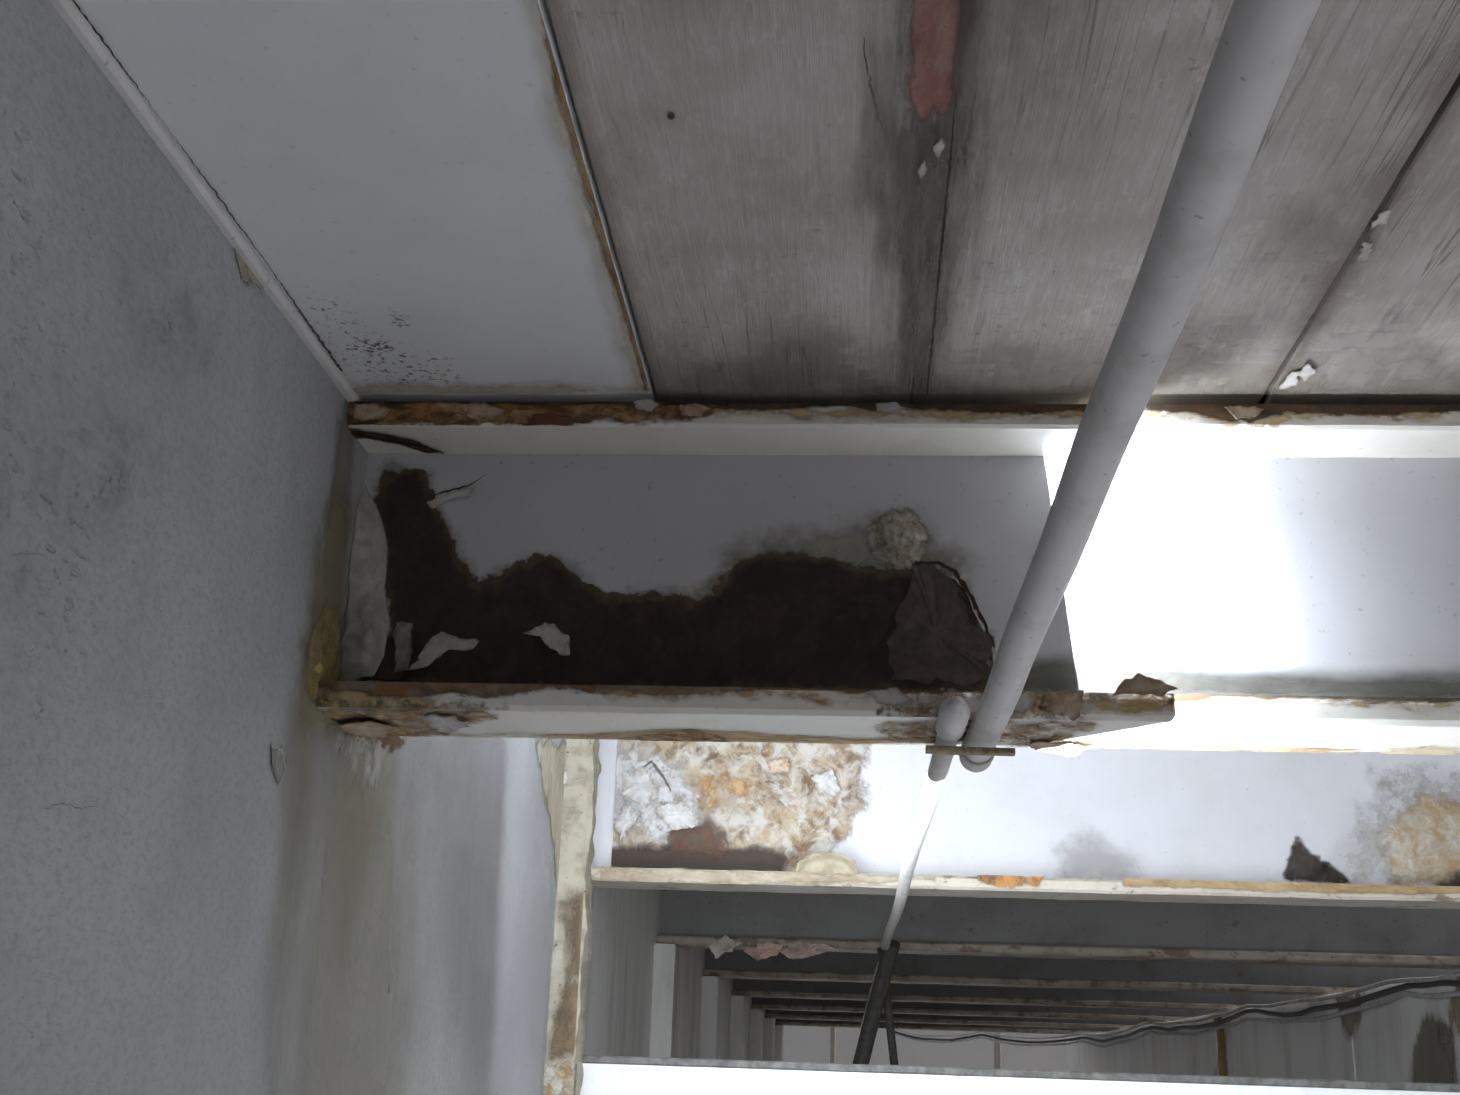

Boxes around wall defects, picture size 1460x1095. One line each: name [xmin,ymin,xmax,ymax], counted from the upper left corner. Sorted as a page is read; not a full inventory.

mould [73,0,450,386]
corrosion [347,18,1087,454]
leakage [863,0,985,395]
corrosion [1141,404,1460,427]
peeling [373,468,997,693]
peeling [1113,673,1178,697]
peeling [536,738,568,887]
spalling [611,739,871,872]
spalling [1347,769,1460,886]
peeling [543,891,584,1095]